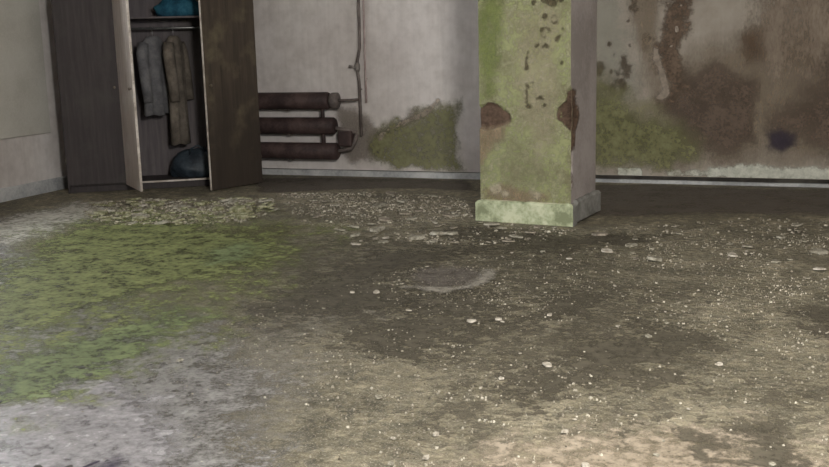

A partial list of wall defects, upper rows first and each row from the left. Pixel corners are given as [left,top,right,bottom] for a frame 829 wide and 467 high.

damp [532,0,564,47]
spalling [480,102,511,161]
spalling [557,89,579,153]